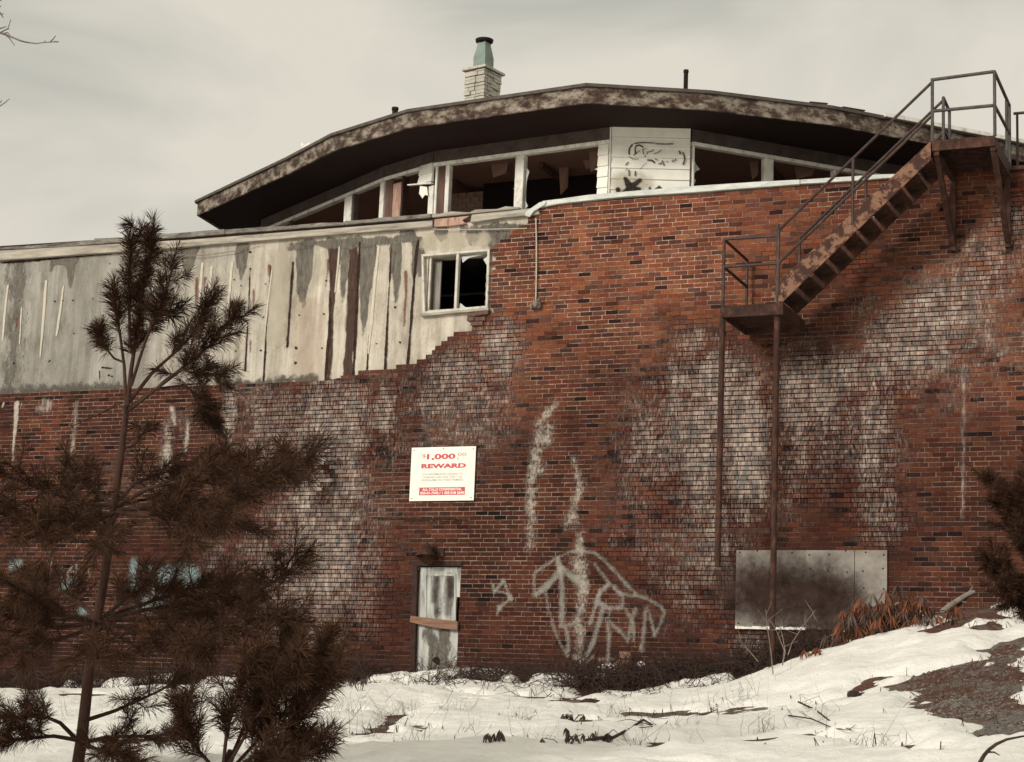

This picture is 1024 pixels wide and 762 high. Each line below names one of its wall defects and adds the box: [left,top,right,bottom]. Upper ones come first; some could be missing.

leakage [0,256,123,455]
efflorescence [158,407,175,484]
leakage [223,230,425,626]
efflorescence [419,317,521,434]
efflorescence [527,408,553,529]
efflorescence [633,352,770,579]
efflorescence [857,401,892,484]
efflorescence [779,236,1010,444]